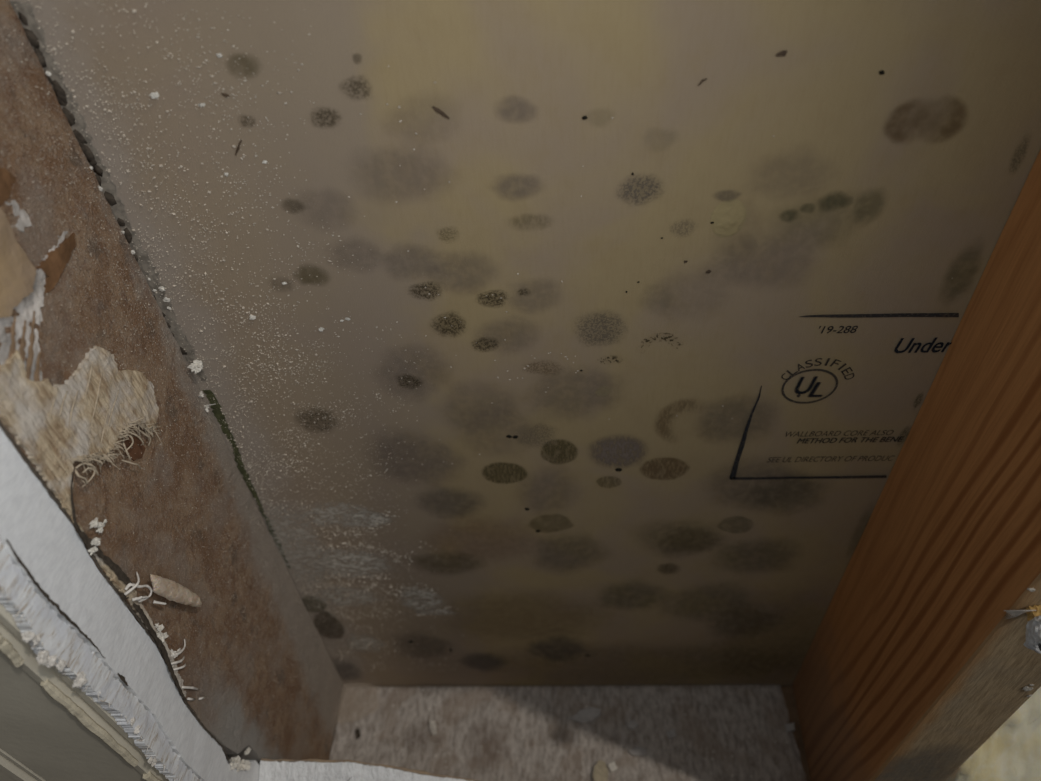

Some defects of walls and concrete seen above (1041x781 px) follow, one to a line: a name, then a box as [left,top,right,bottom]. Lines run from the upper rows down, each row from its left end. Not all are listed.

peeling [0,167,76,318]
water stain [203,390,290,568]
water stain [483,463,526,483]